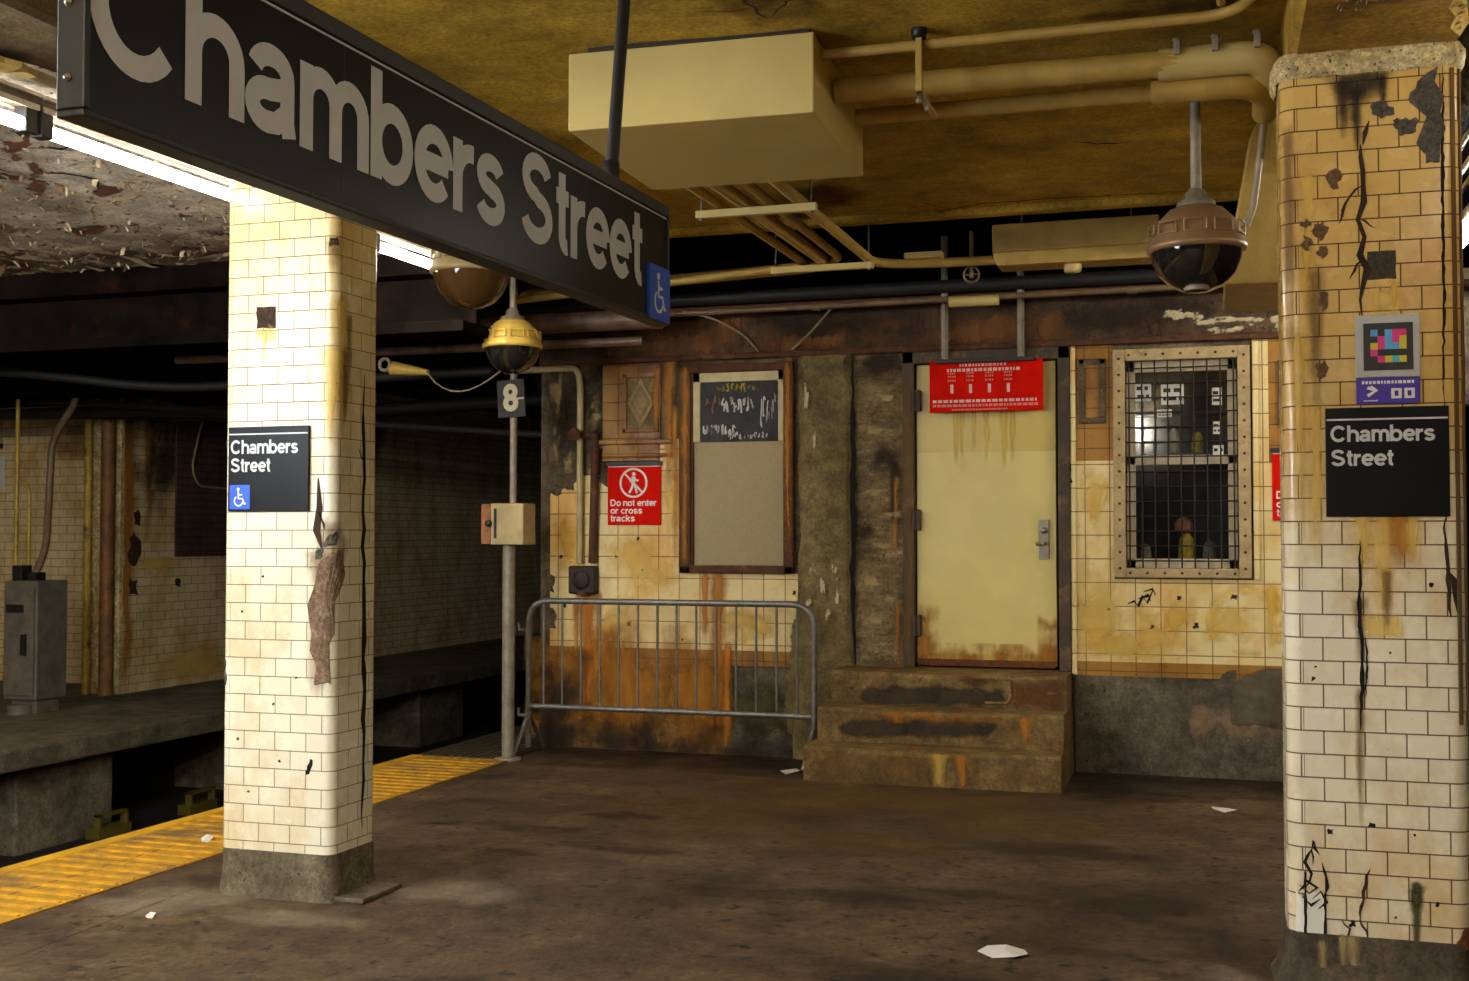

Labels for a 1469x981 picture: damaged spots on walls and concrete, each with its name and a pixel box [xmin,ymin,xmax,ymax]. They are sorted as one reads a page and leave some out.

crack [698,0,793,19]
water stain [1336,72,1386,142]
spalling [1370,66,1446,163]
peeling [0,128,230,276]
crack [1339,121,1375,316]
peeling [1165,310,1278,334]
spalling [295,531,345,685]
rust [1360,516,1415,621]
rust [546,573,731,748]
rust [883,712,968,722]
rust [1014,681,1062,742]
crack [1341,869,1371,937]